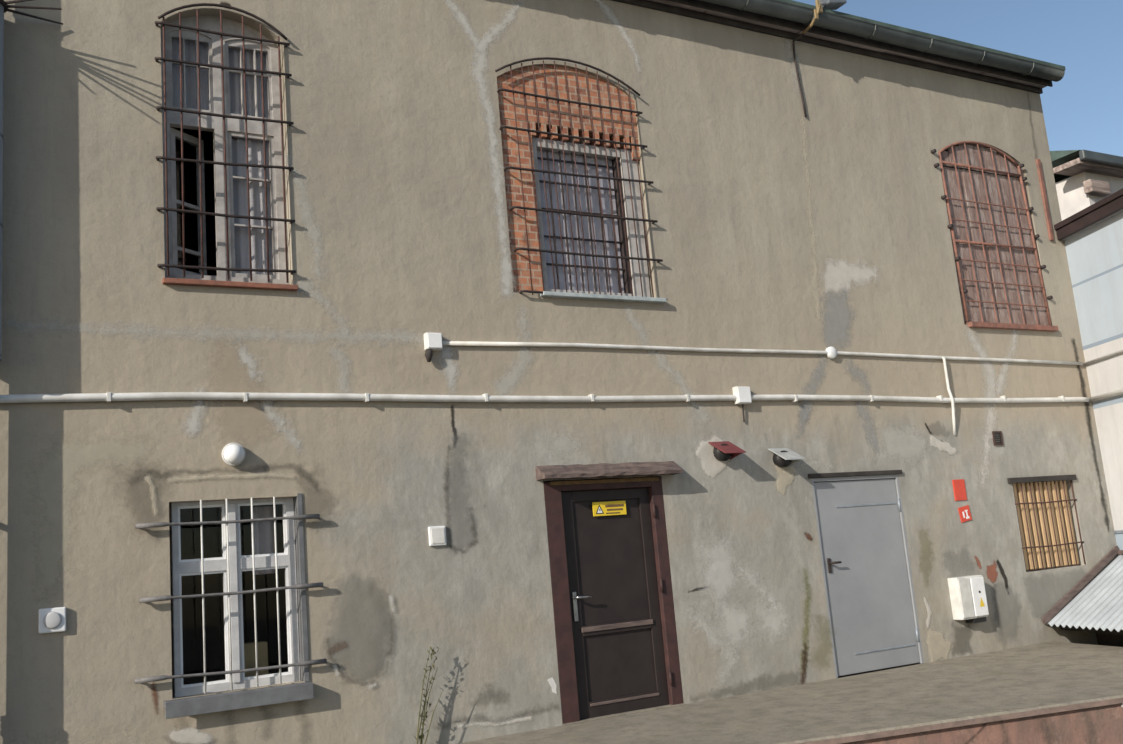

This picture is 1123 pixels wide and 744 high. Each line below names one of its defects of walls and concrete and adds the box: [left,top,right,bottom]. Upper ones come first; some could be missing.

crack [596,0,640,70]
crack [446,0,519,295]
flaking render [170,728,214,744]